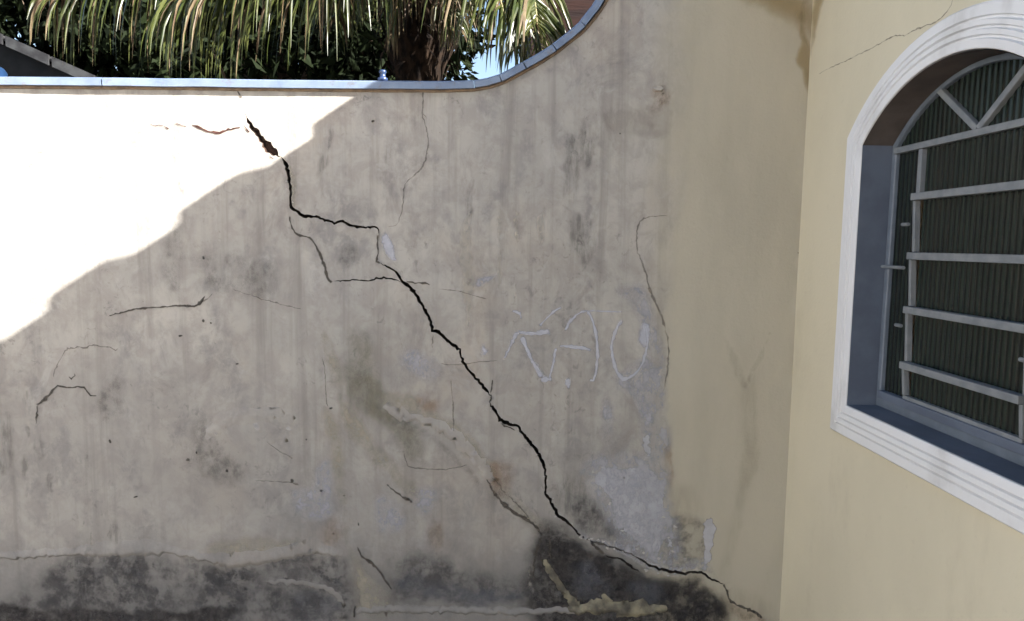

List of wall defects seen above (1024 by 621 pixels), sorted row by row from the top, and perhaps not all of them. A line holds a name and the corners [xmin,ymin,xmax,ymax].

crack [109,294,212,316]
crack [35,345,116,423]
crack [151,91,762,618]
peeling [592,457,687,574]
leakage [0,556,347,621]
leakage [396,527,726,621]